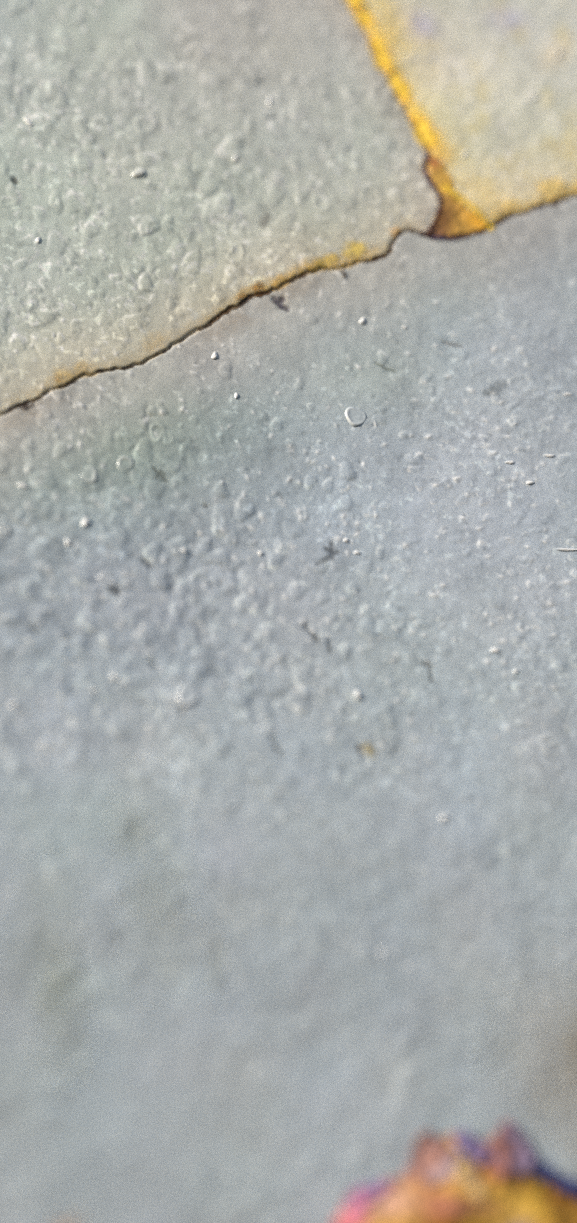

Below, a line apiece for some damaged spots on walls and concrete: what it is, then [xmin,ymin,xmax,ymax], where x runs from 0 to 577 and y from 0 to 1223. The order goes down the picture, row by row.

crack [5,0,577,414]
rust [239,242,372,298]
rust [347,0,452,197]
spalling [419,153,493,240]